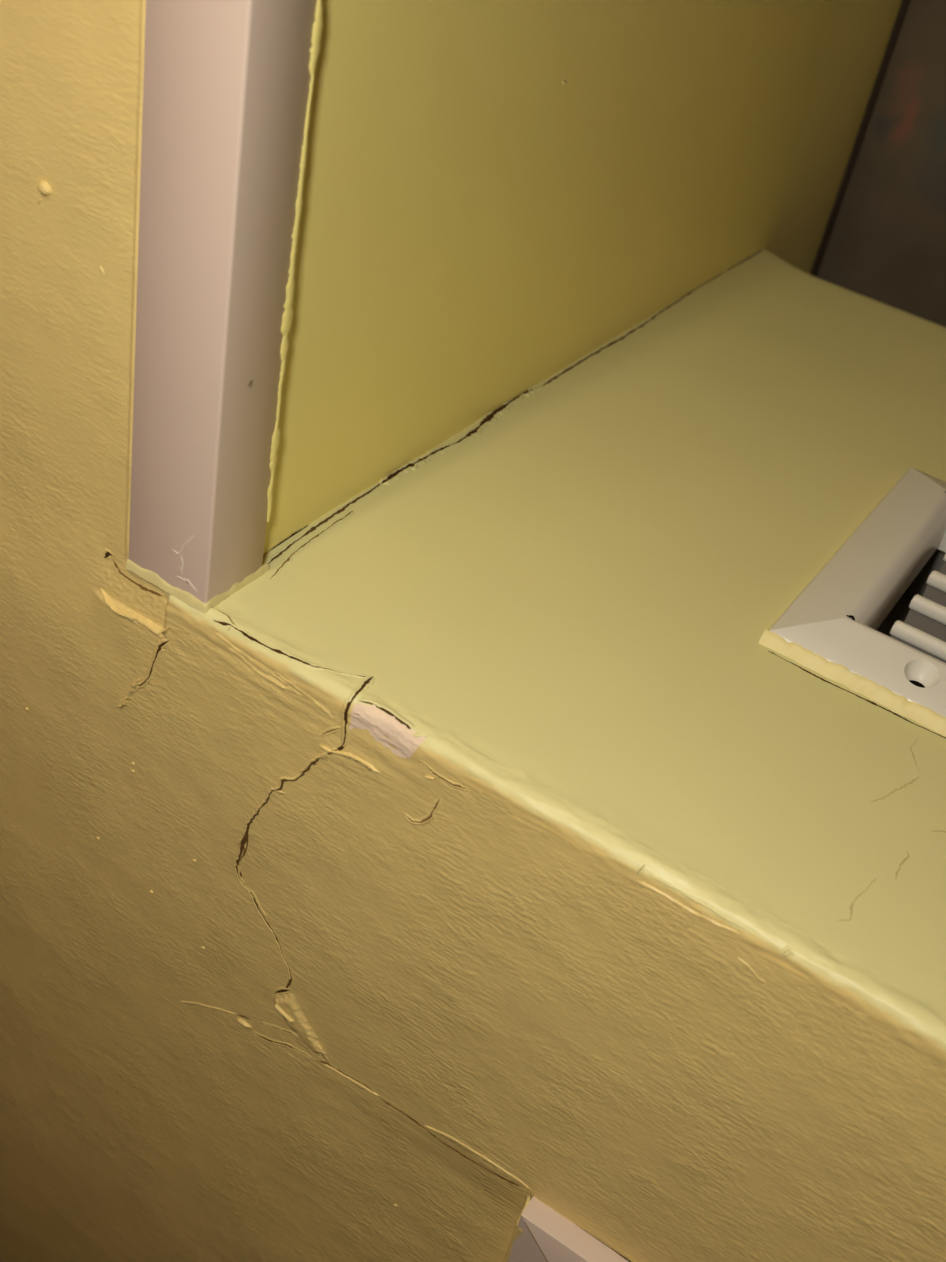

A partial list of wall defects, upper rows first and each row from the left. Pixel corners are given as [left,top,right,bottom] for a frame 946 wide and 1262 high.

crack [262,250,763,580]
flaking render [101,548,170,636]
crack [118,638,170,708]
crack [211,596,375,995]
peeling [313,745,380,773]
flaking render [349,697,486,793]
crack [402,775,442,825]
crack [769,651,946,802]
crack [839,850,910,921]
crack [180,1001,237,1015]
crack [317,1060,530,1189]